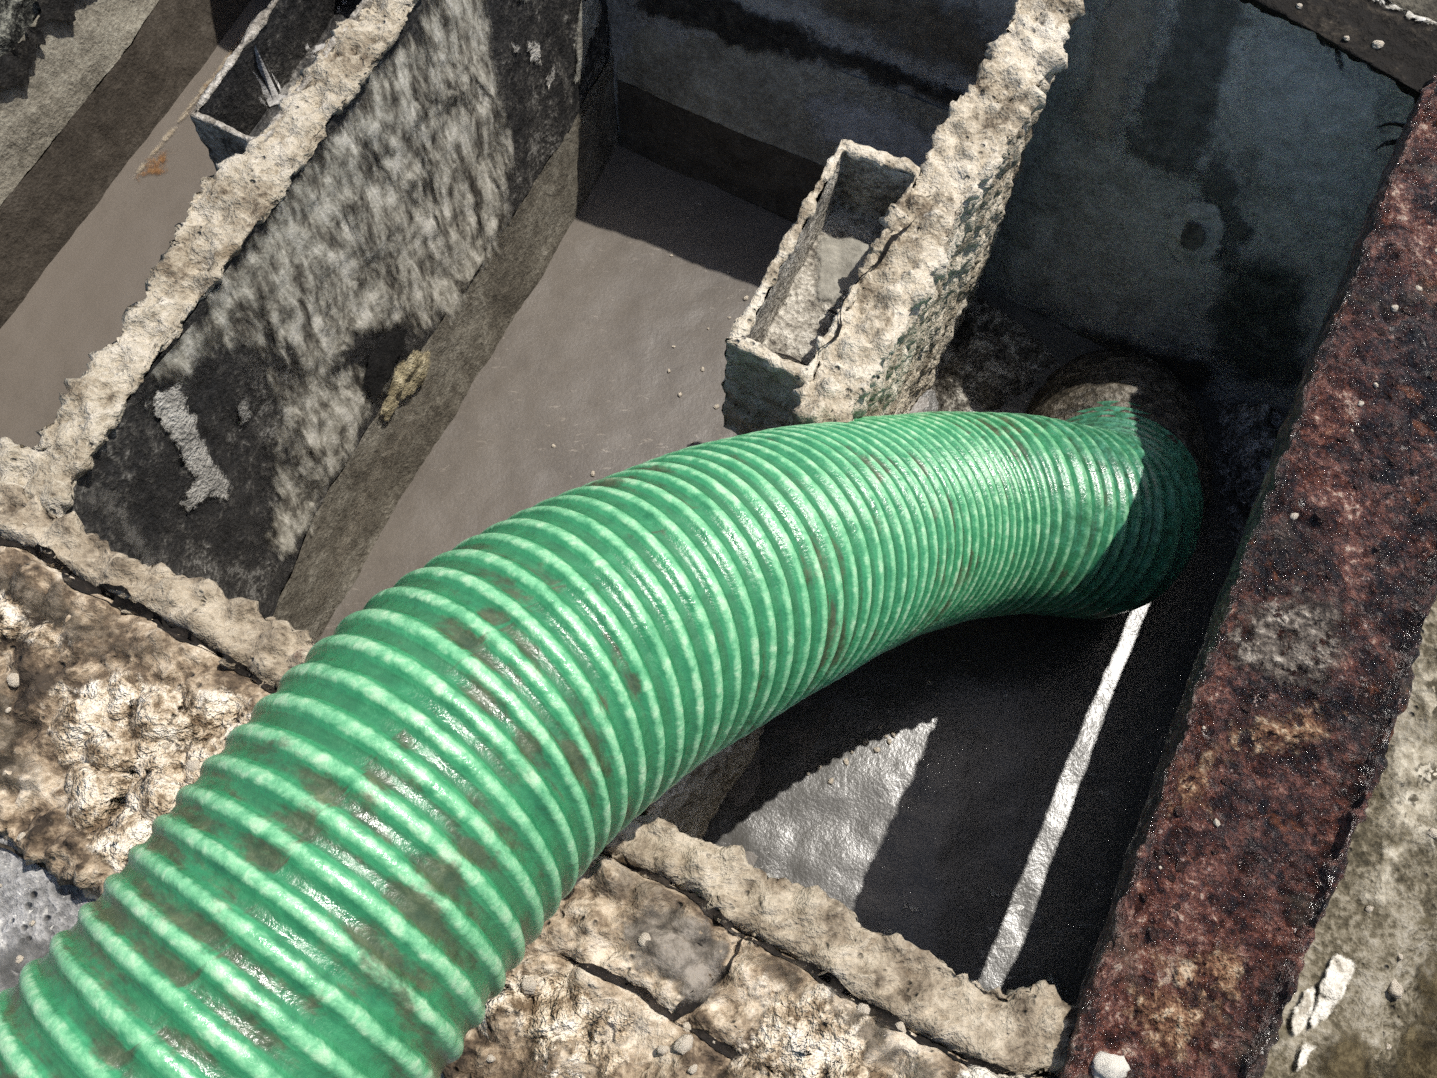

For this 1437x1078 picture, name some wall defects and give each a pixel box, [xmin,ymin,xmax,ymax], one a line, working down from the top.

rust [137,35,244,174]
leakage [638,0,992,107]
leakage [1036,0,1379,390]
crack [773,218,916,366]
leakage [101,492,155,566]
crack [0,536,277,693]
rust [1229,589,1344,686]
rust [1174,709,1328,806]
crack [560,854,1044,1078]
rust [1124,946,1246,1060]